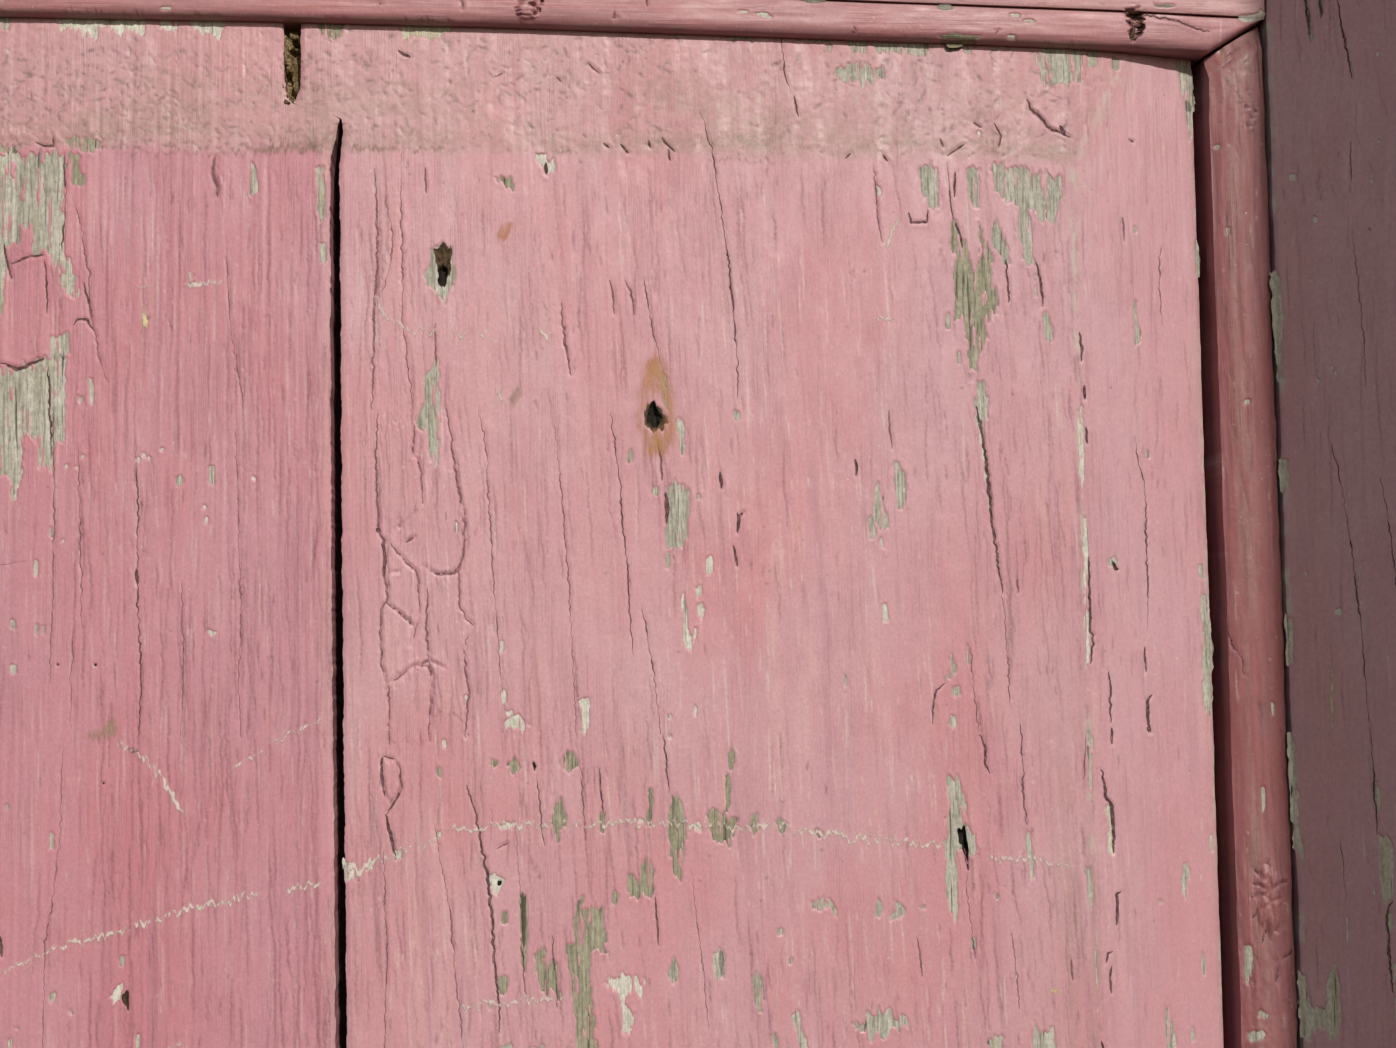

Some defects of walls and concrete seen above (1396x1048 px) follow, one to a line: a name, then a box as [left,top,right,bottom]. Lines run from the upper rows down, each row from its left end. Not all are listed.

peeling [0,135,106,314]
peeling [0,331,94,503]
crack [561,302,572,375]
peeling [945,162,1062,511]
crack [371,153,503,1048]
crack [554,426,603,839]
crack [932,406,1028,825]
crack [466,782,558,1033]
peeling [488,857,654,1048]
peeling [638,749,760,882]
spalling [944,775,977,922]
peeling [1297,964,1342,1040]